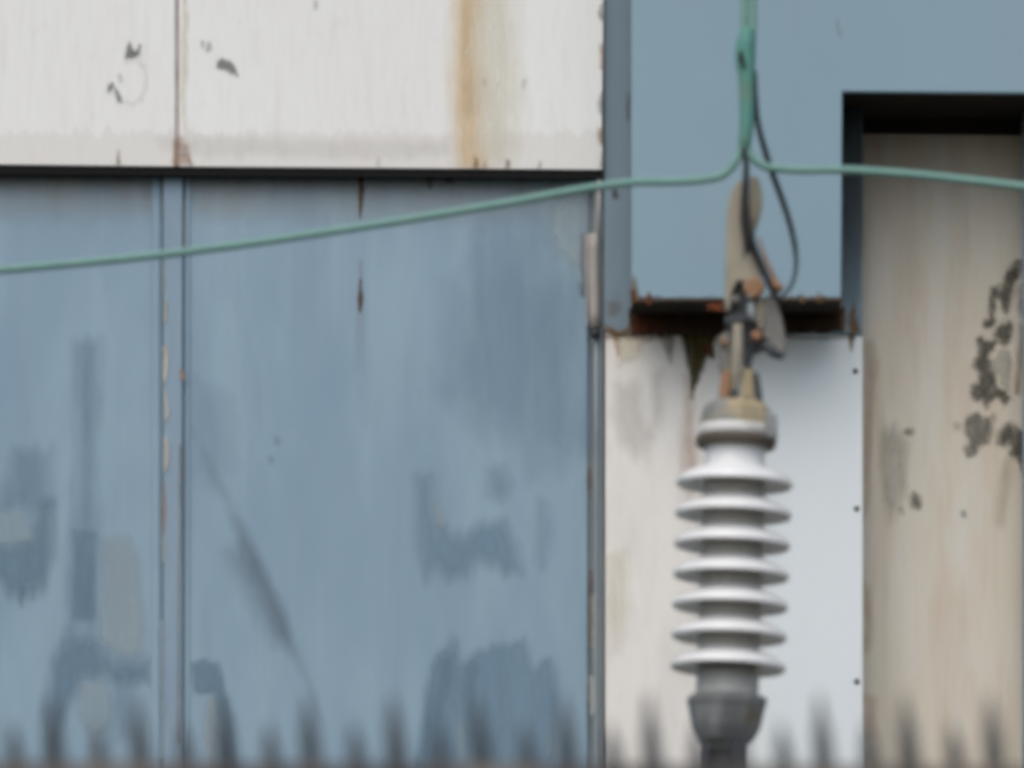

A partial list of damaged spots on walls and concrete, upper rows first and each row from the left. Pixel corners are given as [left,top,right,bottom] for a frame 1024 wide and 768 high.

peeling [126,42,141,58]
peeling [217,59,237,75]
corrosion [605,282,728,359]
corrosion [780,296,858,347]